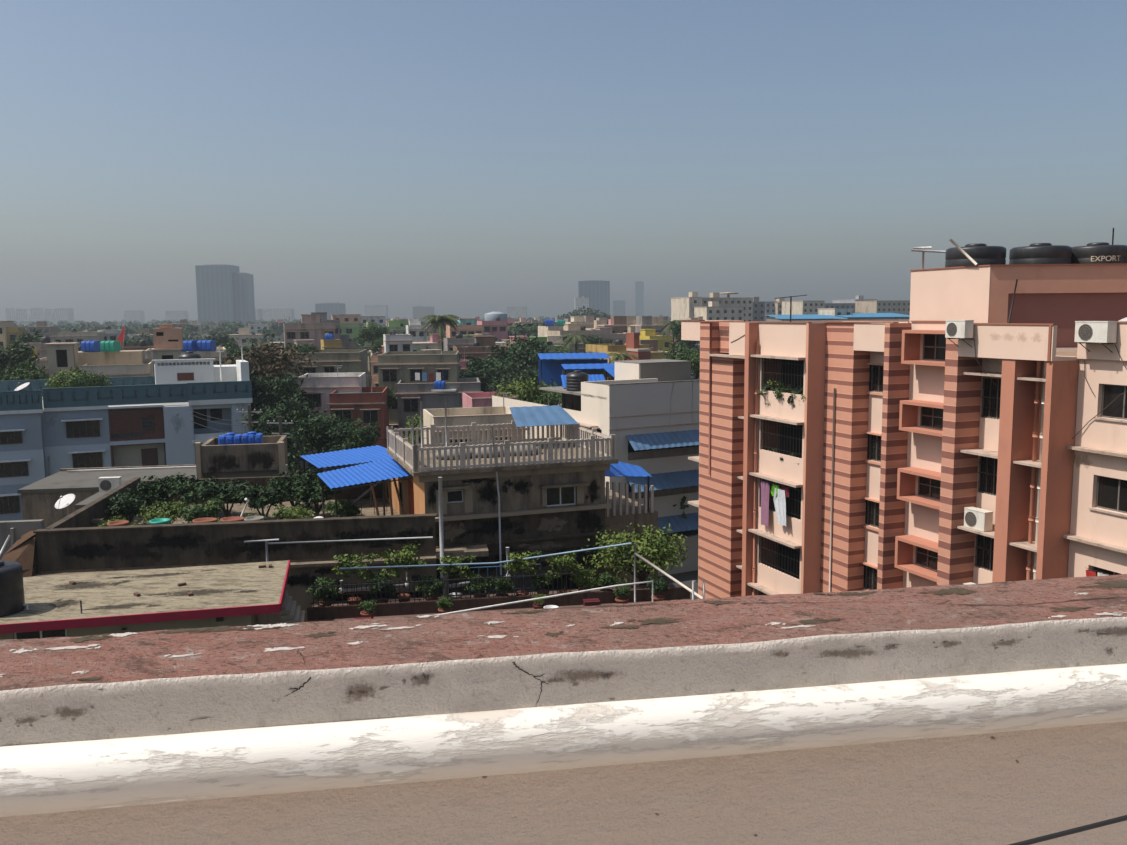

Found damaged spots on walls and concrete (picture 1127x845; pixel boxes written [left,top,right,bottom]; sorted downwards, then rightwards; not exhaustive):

crack [512,662,548,704]